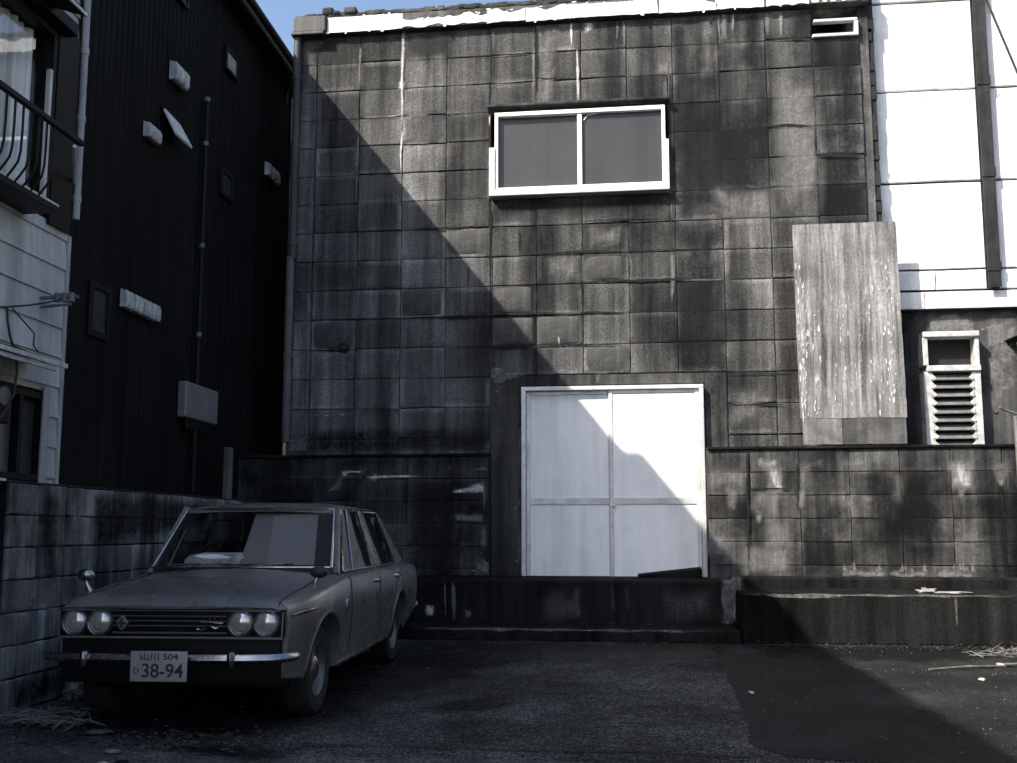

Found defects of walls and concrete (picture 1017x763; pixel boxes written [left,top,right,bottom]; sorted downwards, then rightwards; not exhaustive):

peeling [326,0,846,34]
water stain [394,34,452,116]
water stain [674,106,772,214]
water stain [783,91,814,187]
peeling [795,259,896,422]
water stain [96,497,207,540]